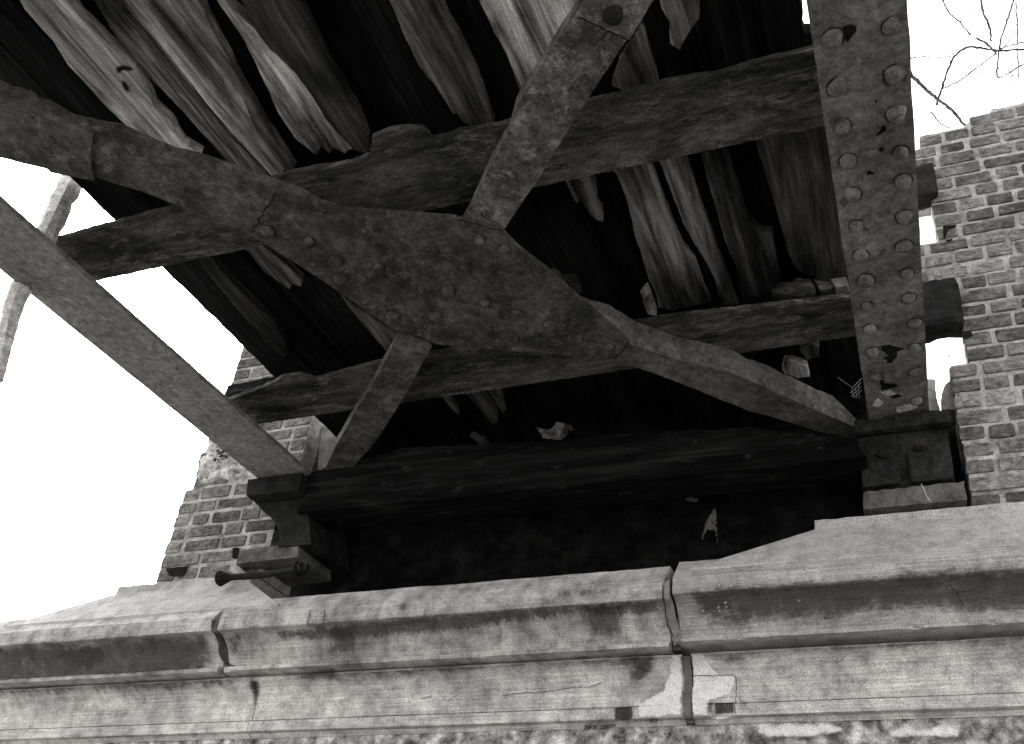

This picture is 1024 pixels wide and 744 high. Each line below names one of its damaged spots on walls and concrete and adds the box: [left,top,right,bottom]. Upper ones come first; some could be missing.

water stain [565,590,621,636]
water stain [331,628,354,653]
crack [662,579,737,725]